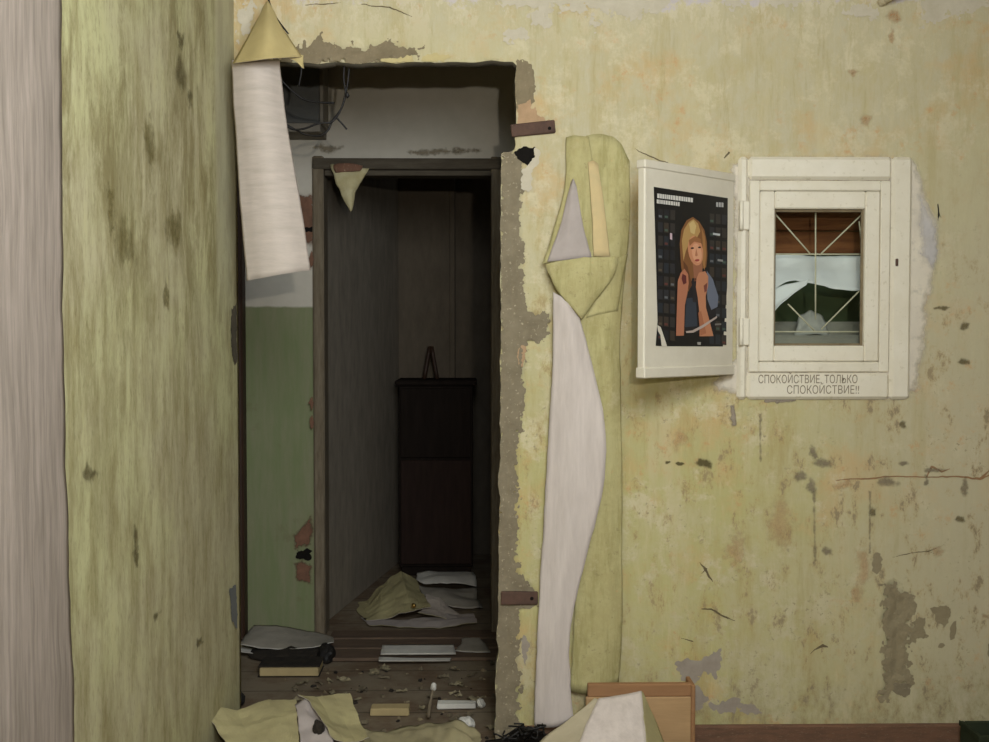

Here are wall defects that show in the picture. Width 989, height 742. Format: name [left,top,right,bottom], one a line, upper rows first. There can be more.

water stain [177,32,192,102]
peeling [235,0,258,44]
spalling [273,32,451,64]
spalling [515,59,550,124]
spalling [299,195,314,267]
spalling [494,146,551,739]
crack [836,466,989,481]
spalling [294,518,313,583]
spalling [872,552,957,703]
spalling [675,648,762,715]